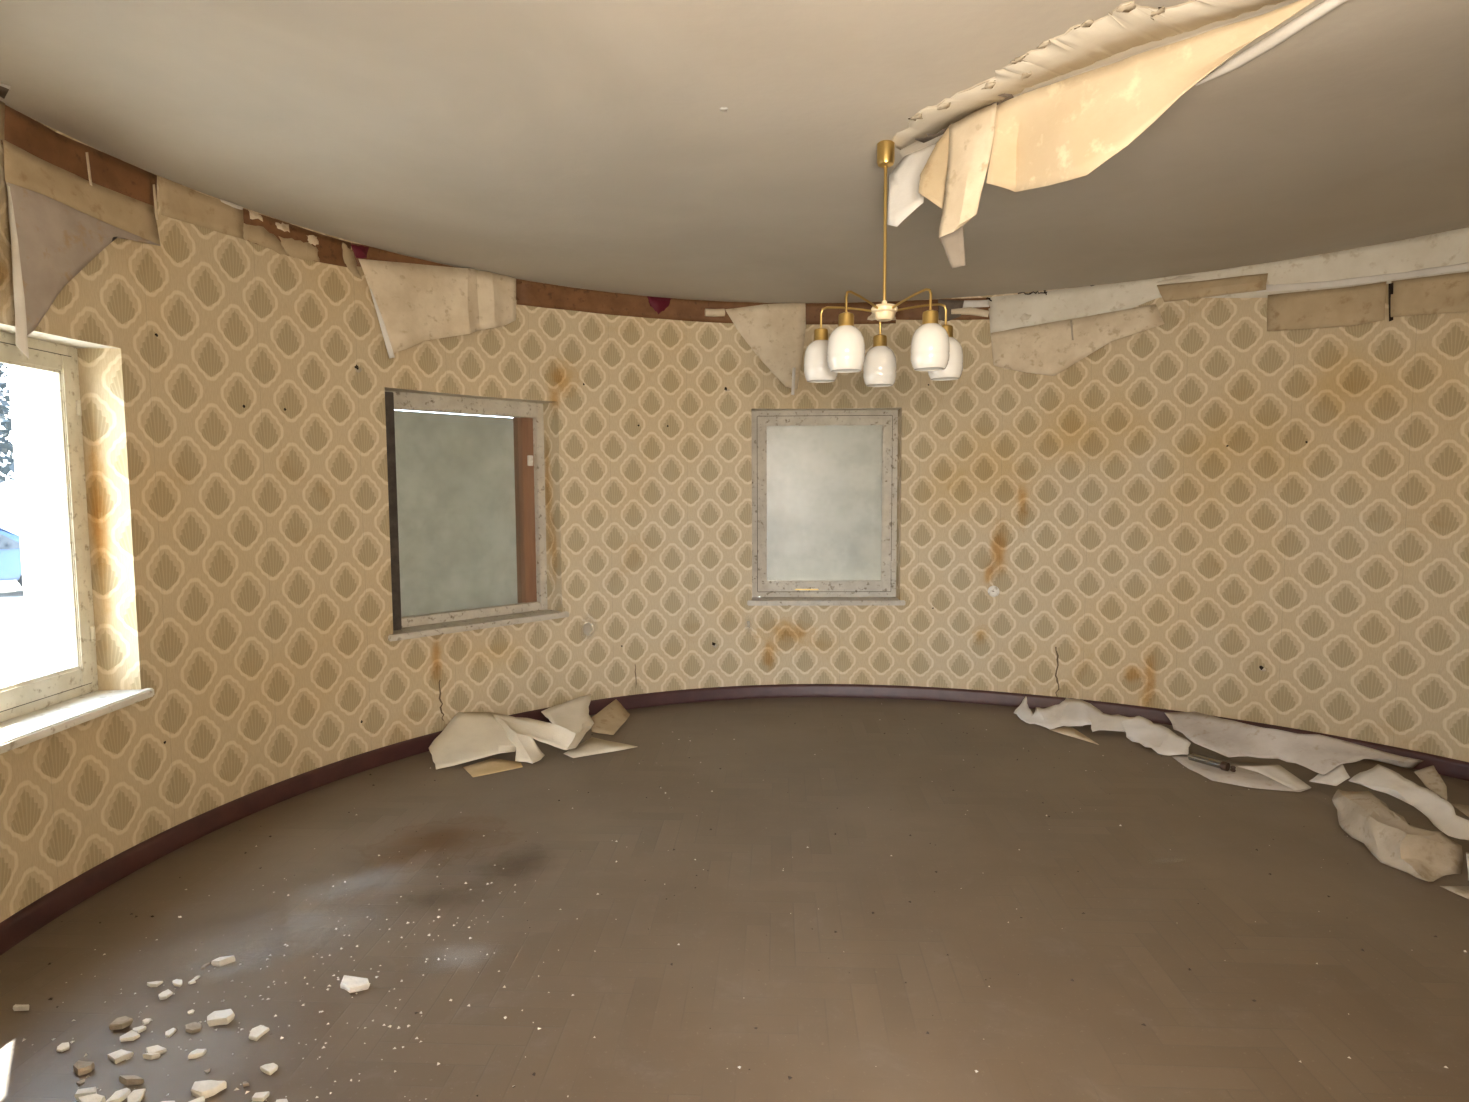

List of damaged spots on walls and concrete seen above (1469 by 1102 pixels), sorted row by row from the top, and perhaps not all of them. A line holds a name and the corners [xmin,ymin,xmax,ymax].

peeling [1010,40,1051,80]
peeling [1116,1,1165,17]
peeling [1,105,244,358]
peeling [351,243,522,359]
peeling [705,303,806,395]
flaking render [988,227,1469,376]